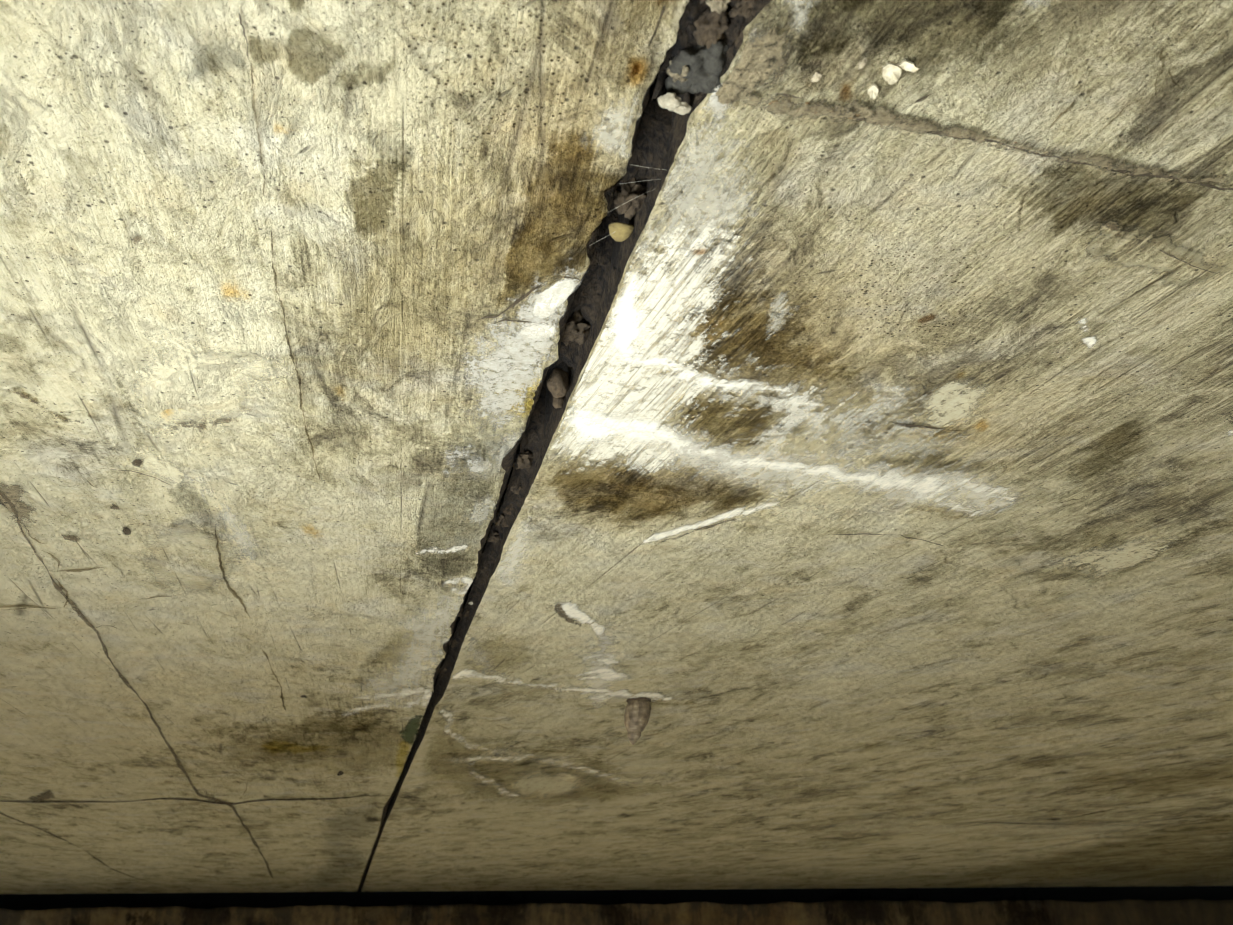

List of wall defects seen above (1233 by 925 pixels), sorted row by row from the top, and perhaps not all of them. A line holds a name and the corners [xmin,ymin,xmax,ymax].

crack [238,11,265,192]
crack [775,93,933,124]
crack [926,96,1233,190]
crack [1098,0,1230,134]
crack [271,231,320,479]
efflorescence [551,217,1014,516]
efflorescence [644,502,838,542]
leakage [445,577,473,594]
crack [0,492,390,882]
efflorescence [345,687,432,715]
efflorescence [452,602,671,703]
efflorescence [440,711,626,799]